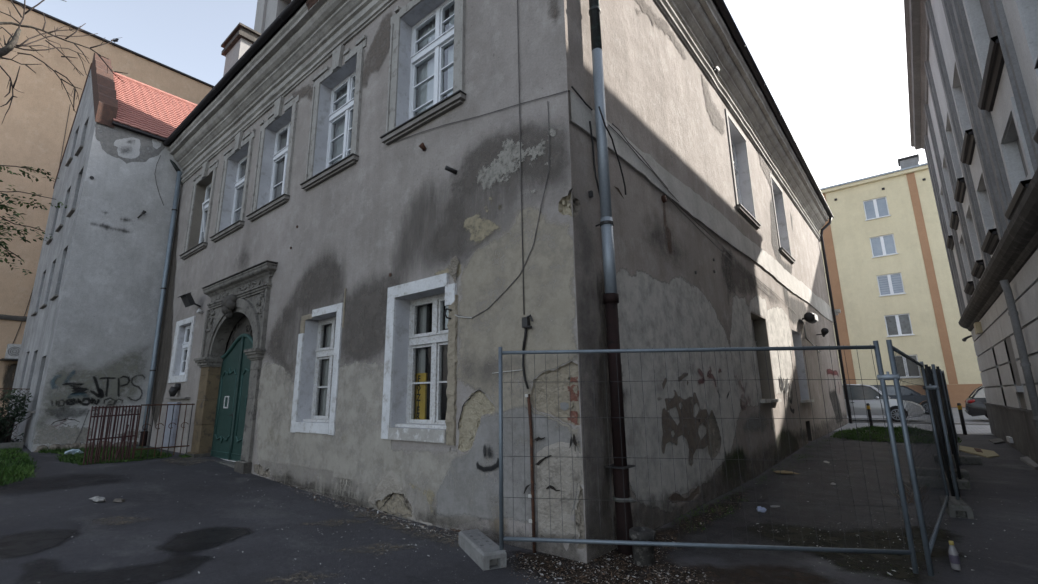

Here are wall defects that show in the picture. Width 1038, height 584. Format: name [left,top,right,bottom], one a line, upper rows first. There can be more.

water stain [636,0,686,59]
flaking render [95,122,167,164]
water stain [401,128,563,266]
peeling [464,124,561,243]
flaking render [558,188,581,218]
water stain [271,258,396,376]
flaking render [530,361,580,426]
flaking render [658,373,721,466]
flaking render [376,493,412,518]